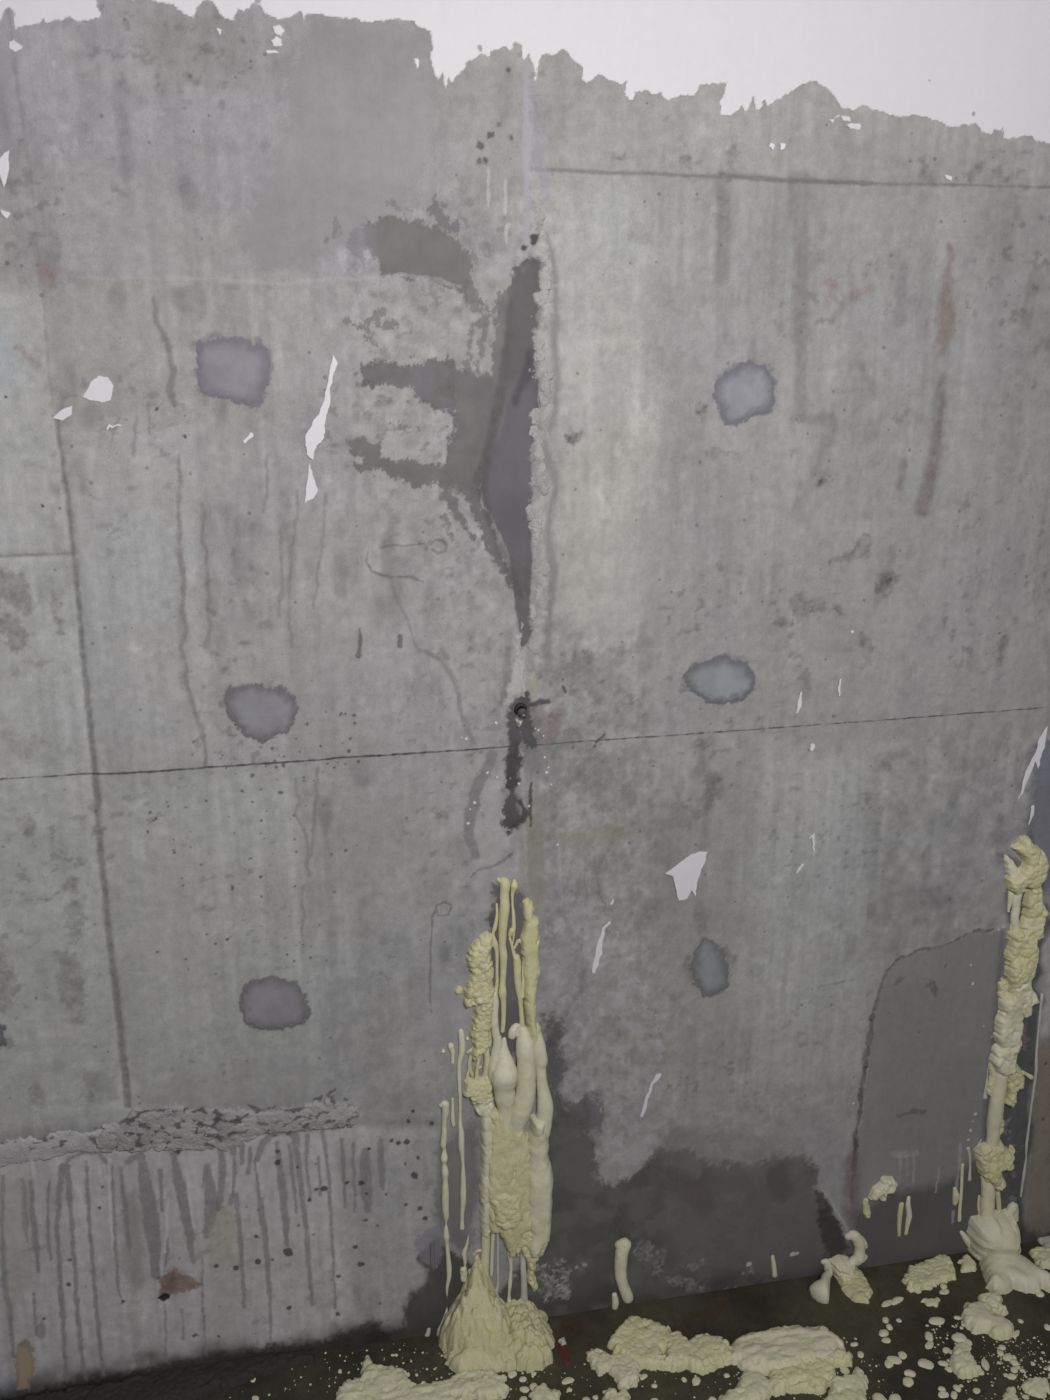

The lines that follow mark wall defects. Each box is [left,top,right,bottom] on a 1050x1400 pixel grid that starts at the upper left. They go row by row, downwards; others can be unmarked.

water stain [244,18,546,589]
water stain [23,1130,385,1380]
water stain [386,1240,472,1341]
water stain [499,910,1005,1317]